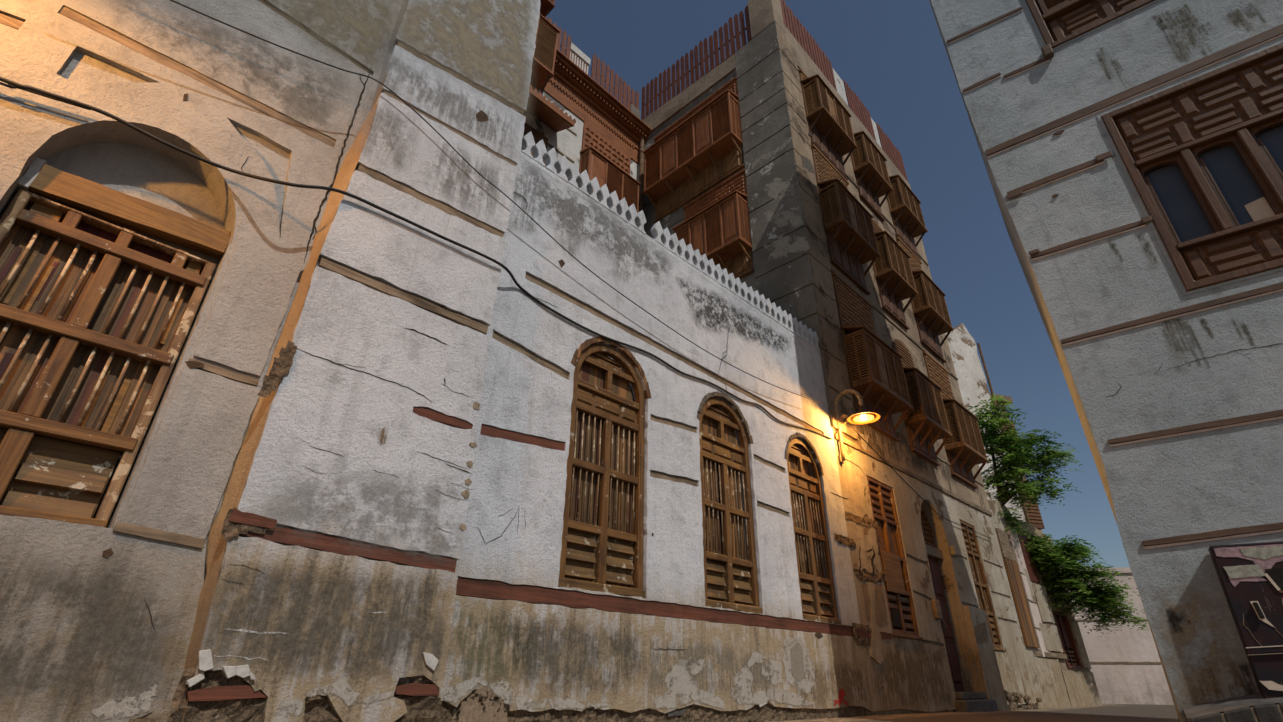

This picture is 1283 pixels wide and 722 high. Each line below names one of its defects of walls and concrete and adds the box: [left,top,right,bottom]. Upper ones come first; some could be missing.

leakage [681,281,787,348]
leakage [0,579,159,721]
spalling [129,649,266,722]
spalling [302,695,341,722]
leakage [443,618,772,710]
spalling [393,637,868,722]
leakage [802,653,949,704]